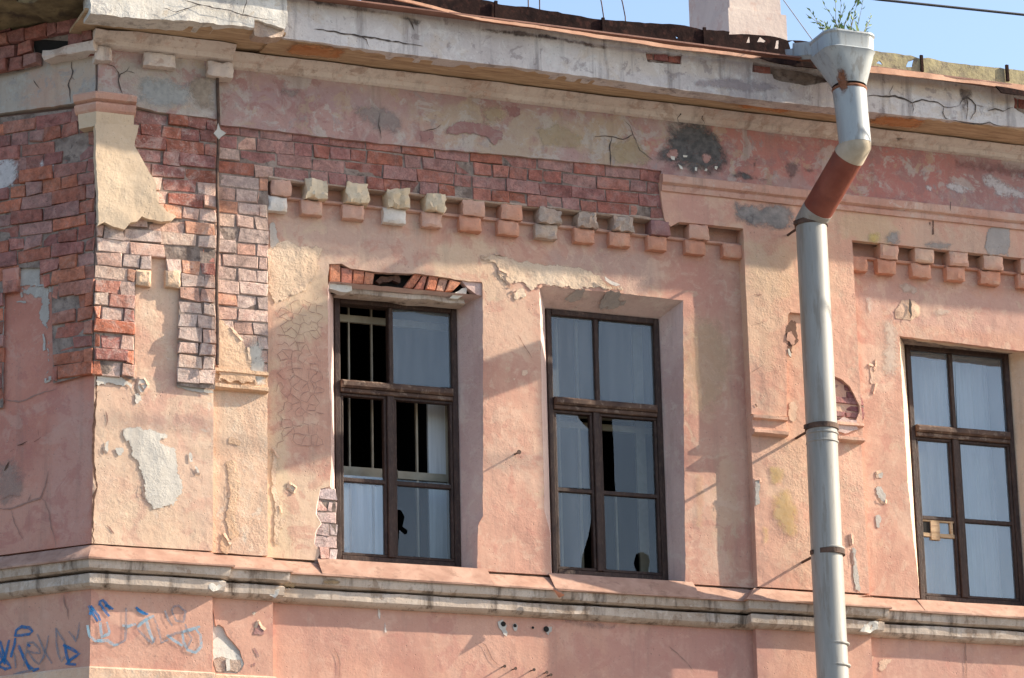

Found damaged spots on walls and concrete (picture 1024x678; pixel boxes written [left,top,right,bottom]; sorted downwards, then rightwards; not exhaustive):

crack [869,87,1013,127]
crack [595,121,651,166]
flaking render [0,109,663,408]
spalling [785,320,799,358]
spalling [835,359,878,434]
peeling [103,427,200,509]
flaking render [213,612,266,673]